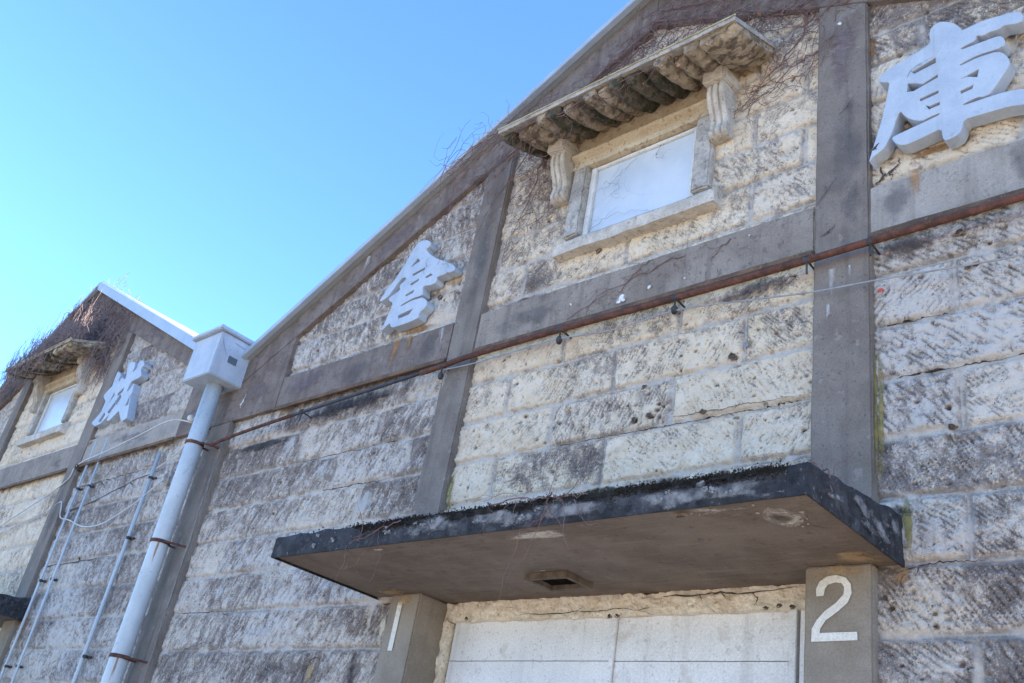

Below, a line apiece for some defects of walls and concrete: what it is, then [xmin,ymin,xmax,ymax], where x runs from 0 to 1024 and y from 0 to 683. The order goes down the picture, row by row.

corrosion [391,325,427,359]
damp [445,478,687,521]
crack [520,587,791,615]